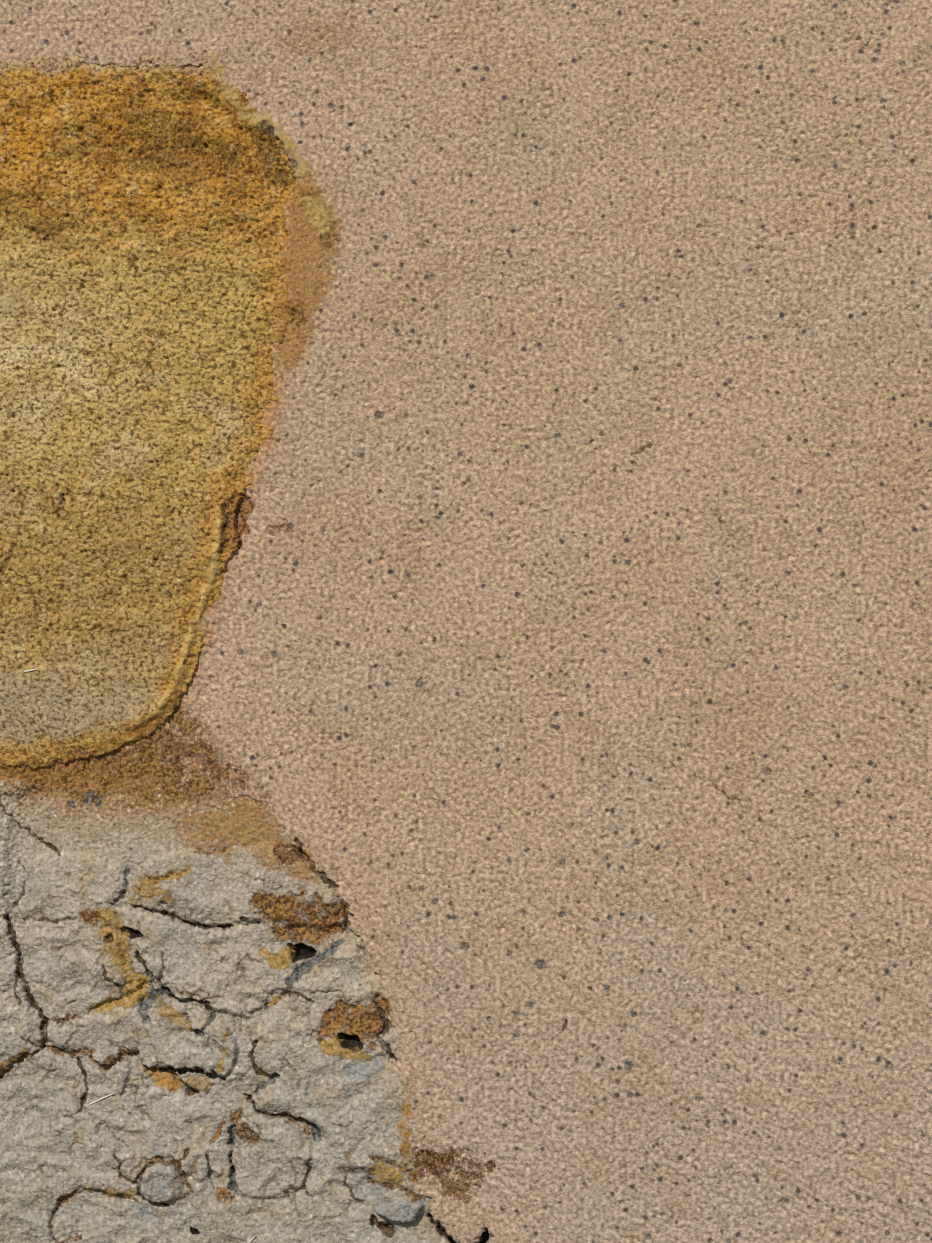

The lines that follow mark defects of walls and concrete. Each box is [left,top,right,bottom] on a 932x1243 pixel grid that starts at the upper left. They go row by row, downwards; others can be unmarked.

flaking render [252,120,341,368]
spalling [220,492,254,551]
peeling [79,907,133,980]
spalling [250,885,349,987]
crack [294,838,364,949]
crack [0,803,321,1243]
spalling [307,993,397,1081]
crack [344,1175,362,1203]
spalling [351,1197,456,1243]